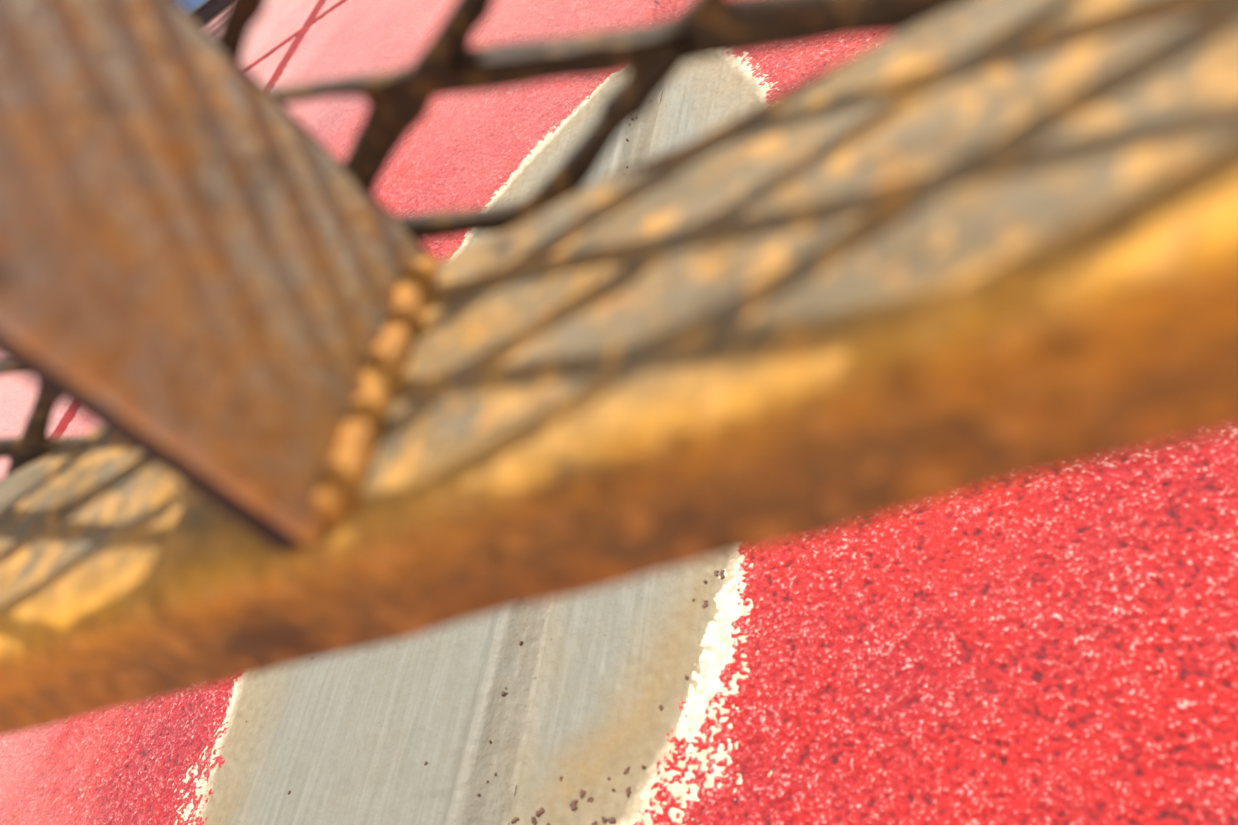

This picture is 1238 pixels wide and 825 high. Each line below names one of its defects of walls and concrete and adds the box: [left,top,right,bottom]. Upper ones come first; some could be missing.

peeling [484,69,629,207]
peeling [580,52,778,191]
peeling [453,231,503,255]
peeling [172,552,759,825]